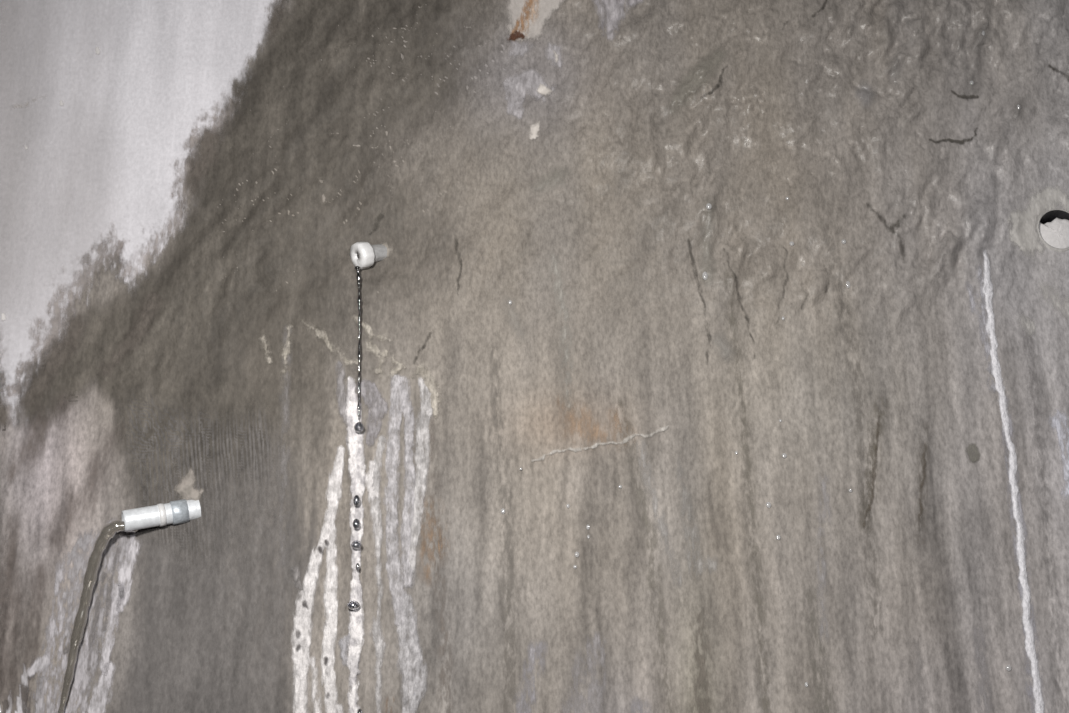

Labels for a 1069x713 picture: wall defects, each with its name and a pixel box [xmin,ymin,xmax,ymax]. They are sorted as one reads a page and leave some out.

corrosion [509,0,538,40]
peeling [507,0,564,67]
peeling [594,0,642,39]
peeling [503,70,554,139]
damp [54,564,64,596]
damp [27,596,65,713]
damp [58,531,139,713]
damp [305,547,327,713]
damp [21,670,43,713]